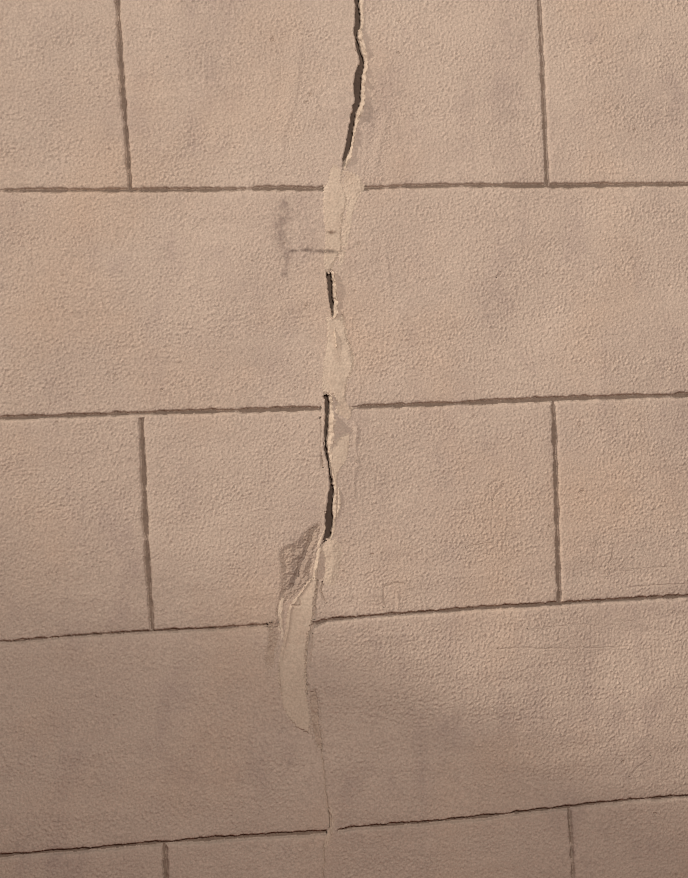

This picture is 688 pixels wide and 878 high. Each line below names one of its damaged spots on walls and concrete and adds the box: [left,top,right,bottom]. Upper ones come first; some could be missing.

crack [304,0,368,694]
crack [277,598,285,639]
spalling [262,521,322,670]
crack [319,747,334,878]